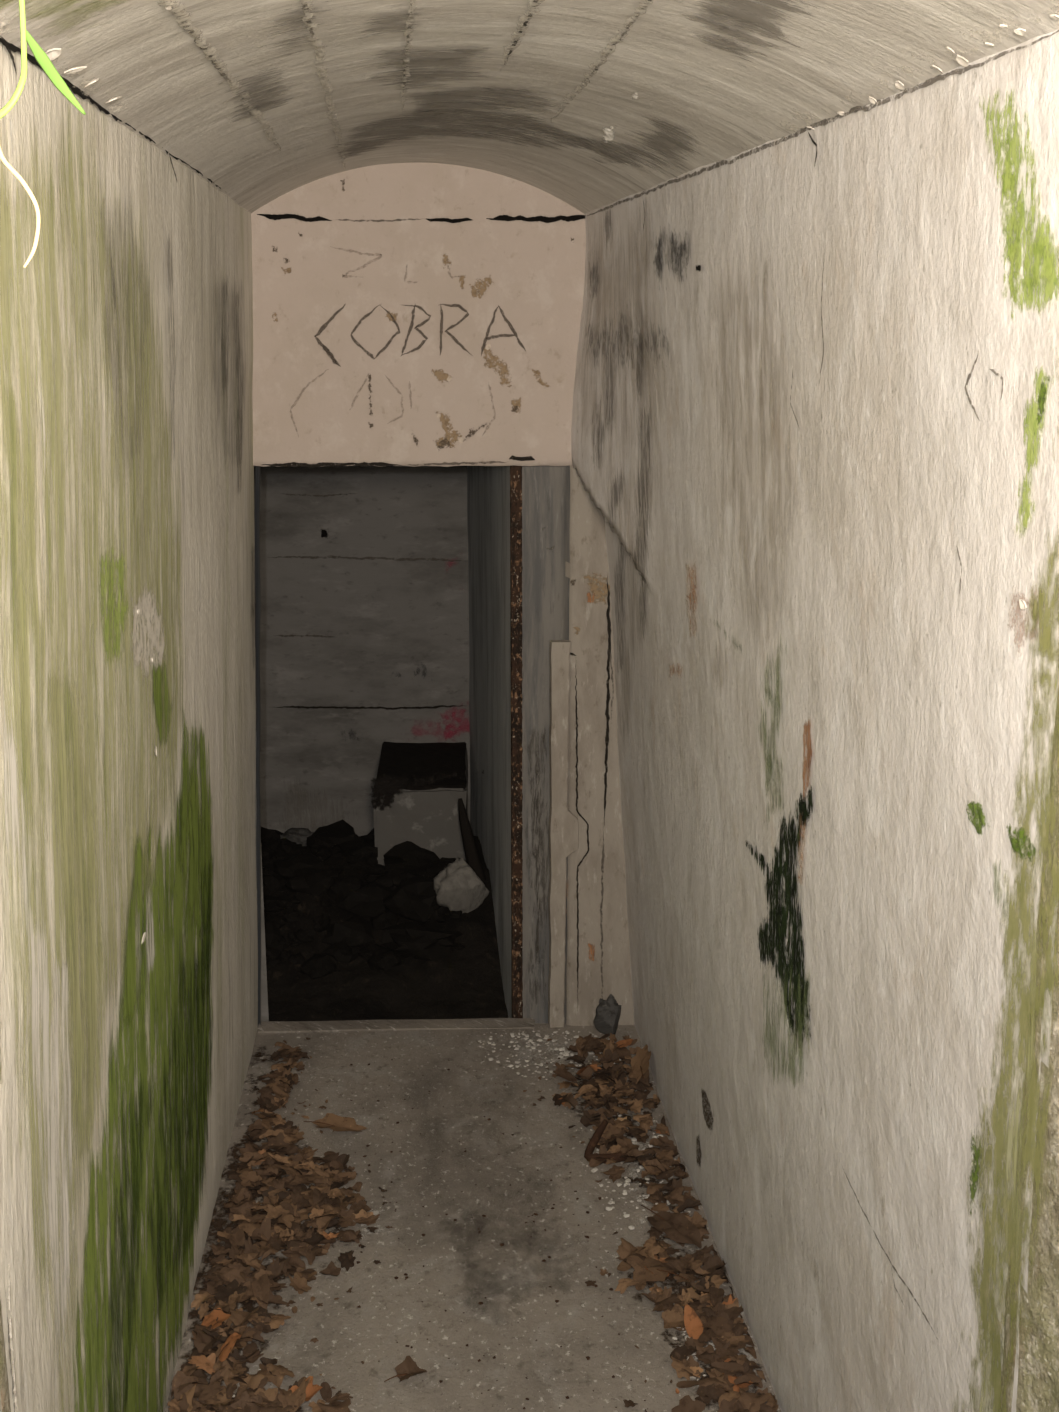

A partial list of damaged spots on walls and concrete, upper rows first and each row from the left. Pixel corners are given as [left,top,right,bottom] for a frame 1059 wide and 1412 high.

crack [500,0,545,71]
damp [685,0,809,61]
damp [224,68,290,122]
damp [337,47,698,178]
crack [0,30,1059,229]
damp [1002,135,1054,300]
damp [746,841,768,874]
damp [798,786,813,823]
damp [109,661,213,1412]
damp [763,973,809,1083]